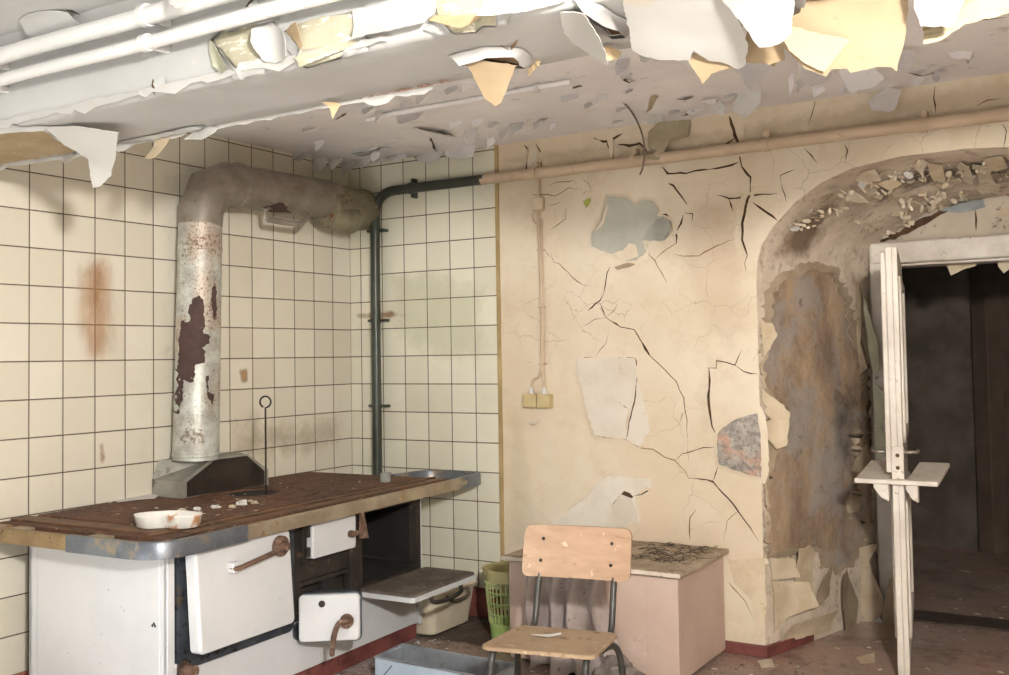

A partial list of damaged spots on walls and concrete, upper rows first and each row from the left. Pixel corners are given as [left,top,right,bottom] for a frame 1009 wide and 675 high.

crack [352,128,456,159]
peeling [0,0,1009,188]
crack [908,70,942,113]
crack [1001,124,1009,146]
peeling [583,193,678,270]
crack [594,97,817,281]
peeling [789,155,1009,239]
crack [880,211,948,242]
peeling [945,264,976,275]
peeling [573,353,654,448]
crack [524,144,769,617]
spalling [713,261,894,641]